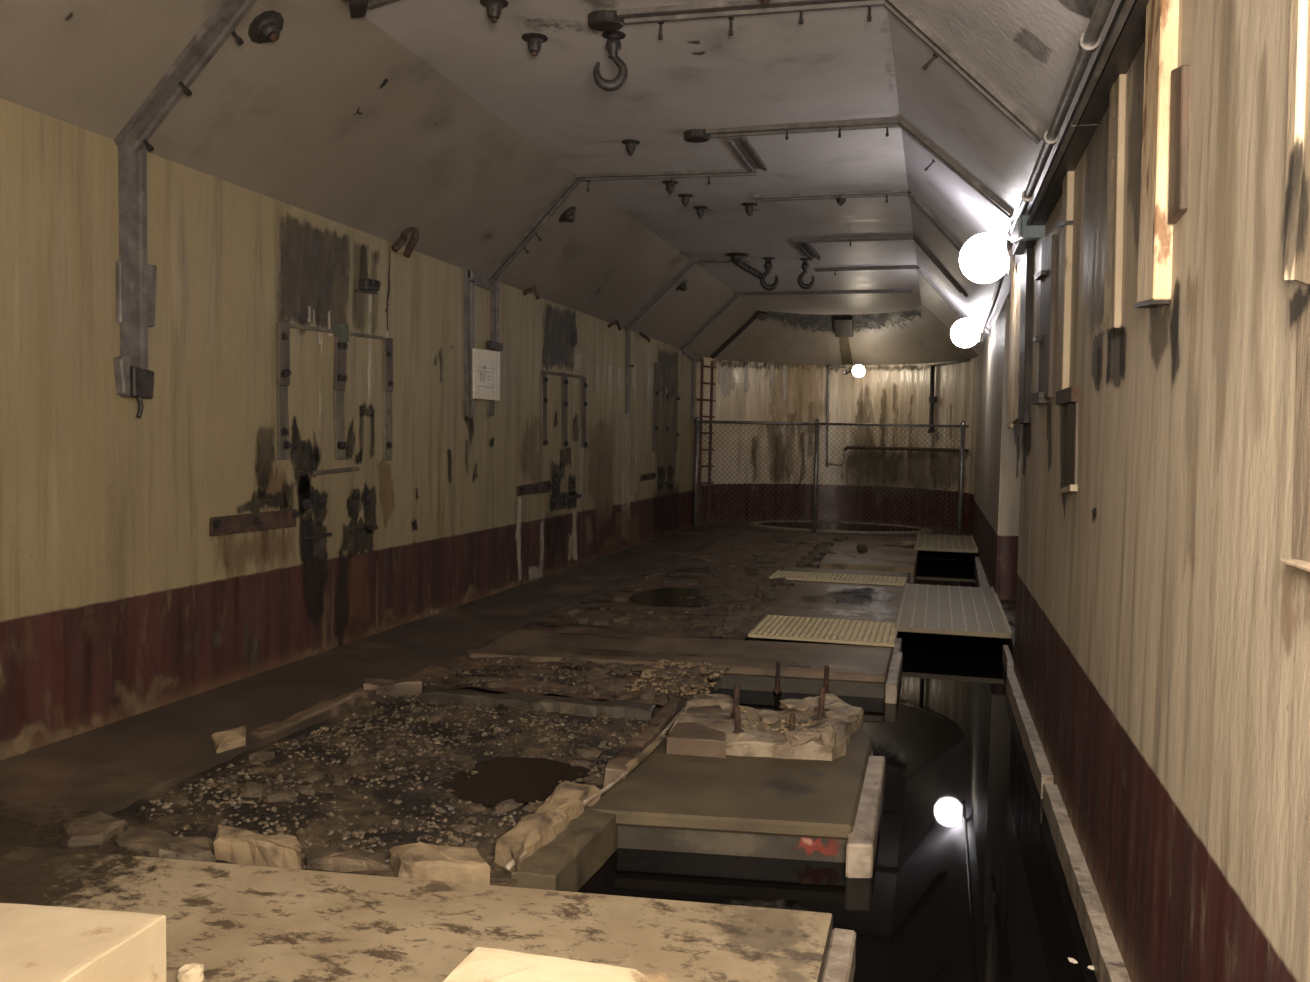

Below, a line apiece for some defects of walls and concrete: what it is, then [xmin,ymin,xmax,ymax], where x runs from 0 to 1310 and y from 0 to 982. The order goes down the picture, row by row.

damp [1059,0,1098,19]
damp [717,359,967,500]
damp [238,417,396,646]